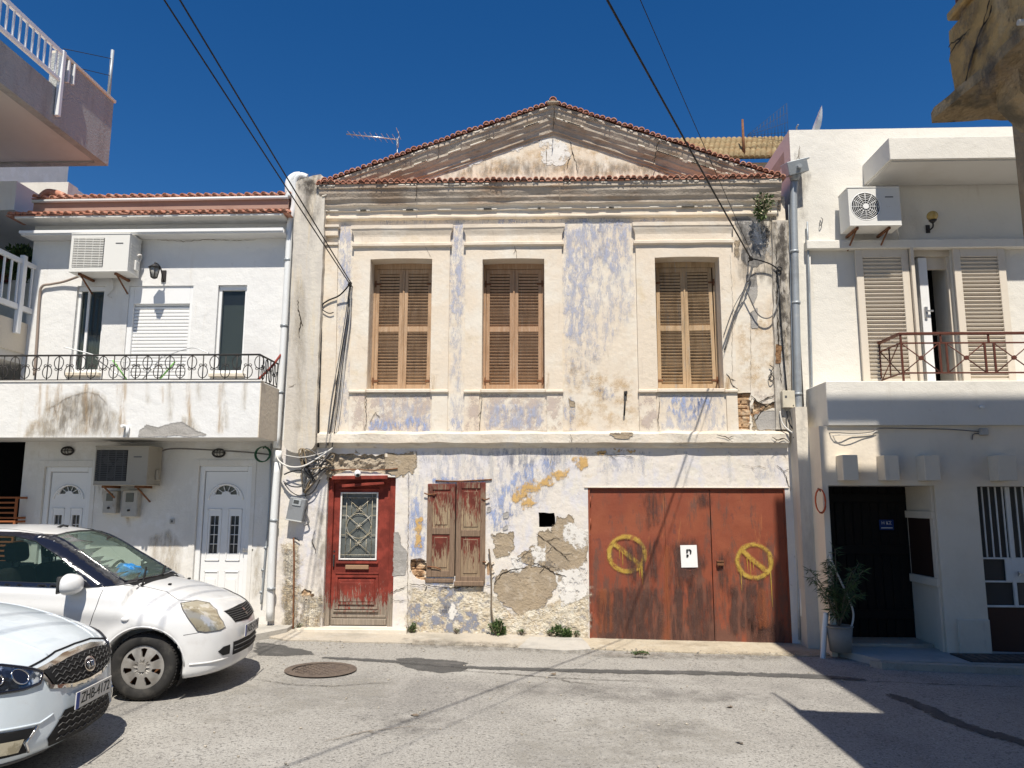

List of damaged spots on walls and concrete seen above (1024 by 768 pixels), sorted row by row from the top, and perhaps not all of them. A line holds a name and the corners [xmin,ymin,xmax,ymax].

peeling [511,138,571,168]
peeling [565,219,631,366]
flaking render [138,422,206,437]
flaking render [737,393,788,431]
peeling [322,395,781,643]
peeling [281,543,324,627]